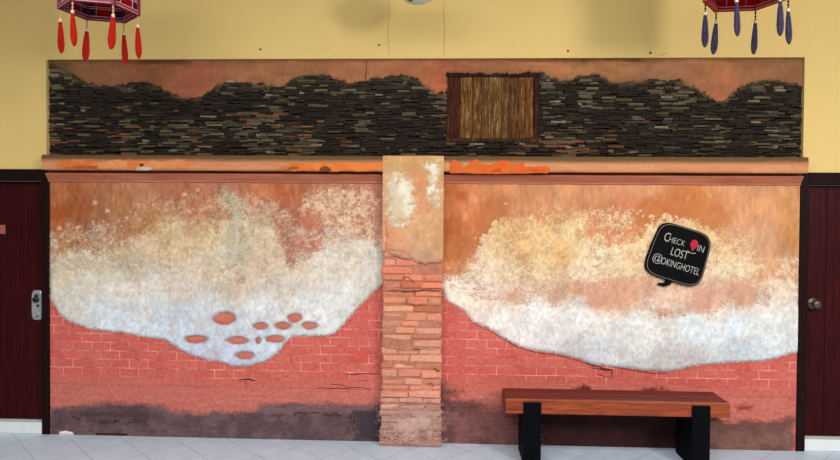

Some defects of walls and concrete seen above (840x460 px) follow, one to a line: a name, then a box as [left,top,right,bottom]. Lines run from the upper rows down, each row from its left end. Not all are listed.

leakage [467,192,512,252]
flaking render [48,63,802,446]
crack [316,373,380,389]
leakage [50,378,519,448]
leakage [541,414,676,448]